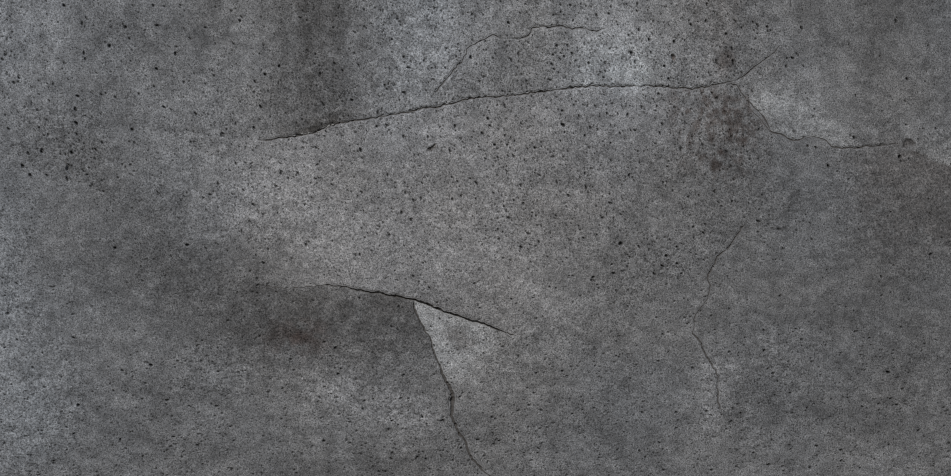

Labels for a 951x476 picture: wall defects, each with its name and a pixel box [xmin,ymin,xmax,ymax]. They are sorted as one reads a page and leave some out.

crack [258,24,894,150]
crack [257,283,516,476]
crack [691,224,745,410]